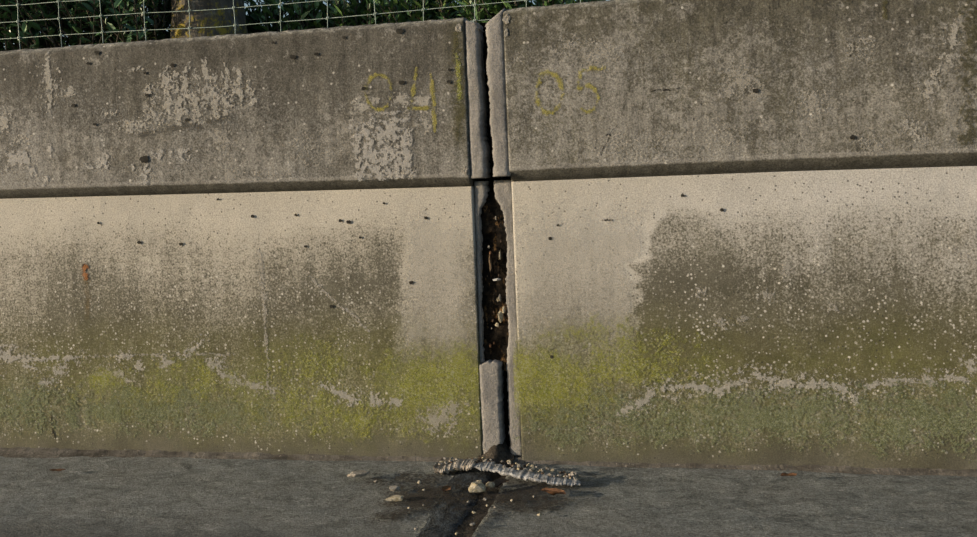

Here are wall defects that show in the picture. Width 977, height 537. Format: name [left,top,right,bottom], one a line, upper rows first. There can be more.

crack [480,22,510,448]
water stain [0,249,278,398]
water stain [317,381,403,408]
water stain [416,401,470,435]
water stain [617,351,977,418]